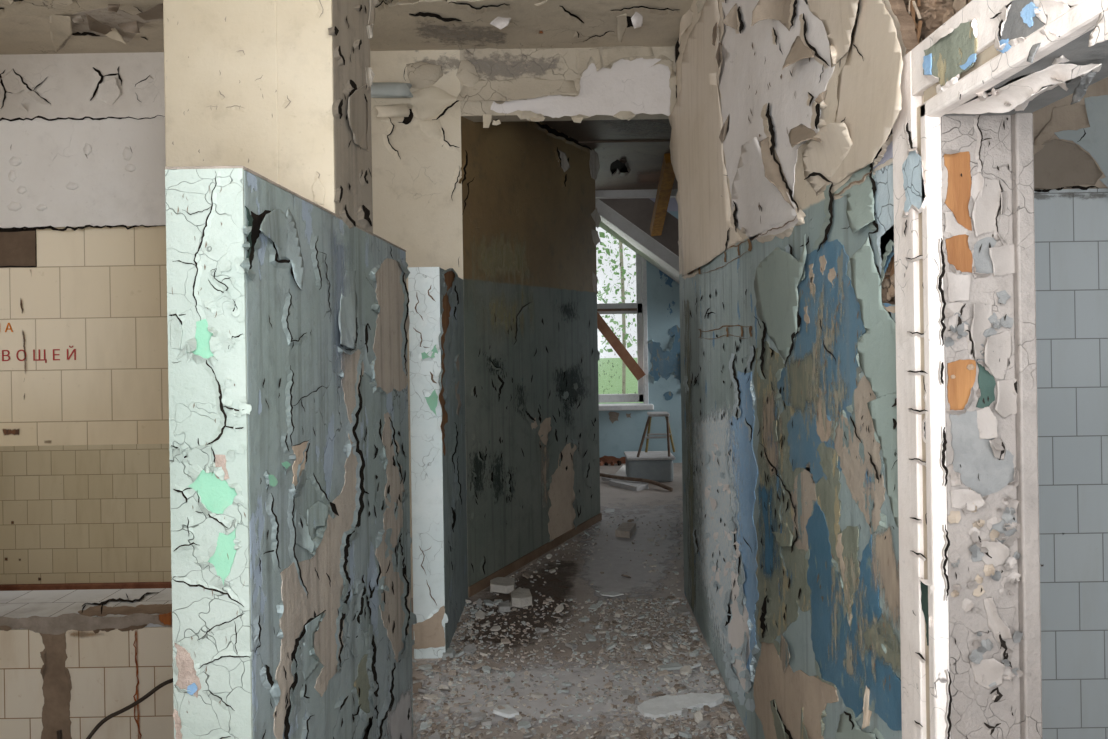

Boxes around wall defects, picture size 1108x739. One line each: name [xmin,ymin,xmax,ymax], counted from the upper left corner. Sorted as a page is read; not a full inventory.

crack [72,30,100,38]
crack [86,67,154,102]
crack [314,0,510,229]
peeling [947,0,1108,189]
crack [82,142,596,739]
peeling [263,258,465,739]
leakage [469,451,516,503]
leakage [554,363,590,424]
peeling [406,0,928,739]
peeling [941,149,1023,690]
spalling [0,604,172,739]
corrosion [133,631,142,739]